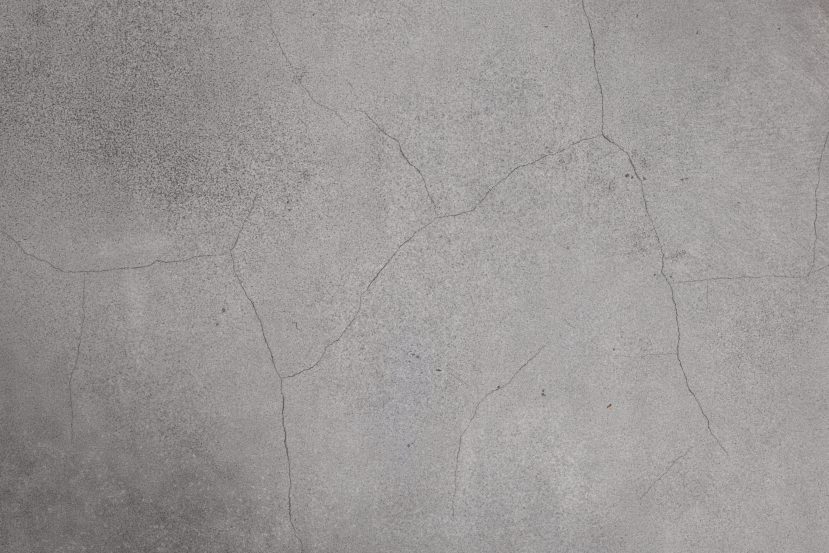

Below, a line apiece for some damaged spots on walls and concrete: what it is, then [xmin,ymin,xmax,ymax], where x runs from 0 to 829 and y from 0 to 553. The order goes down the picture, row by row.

crack [2,195,430,553]
crack [357,0,829,449]